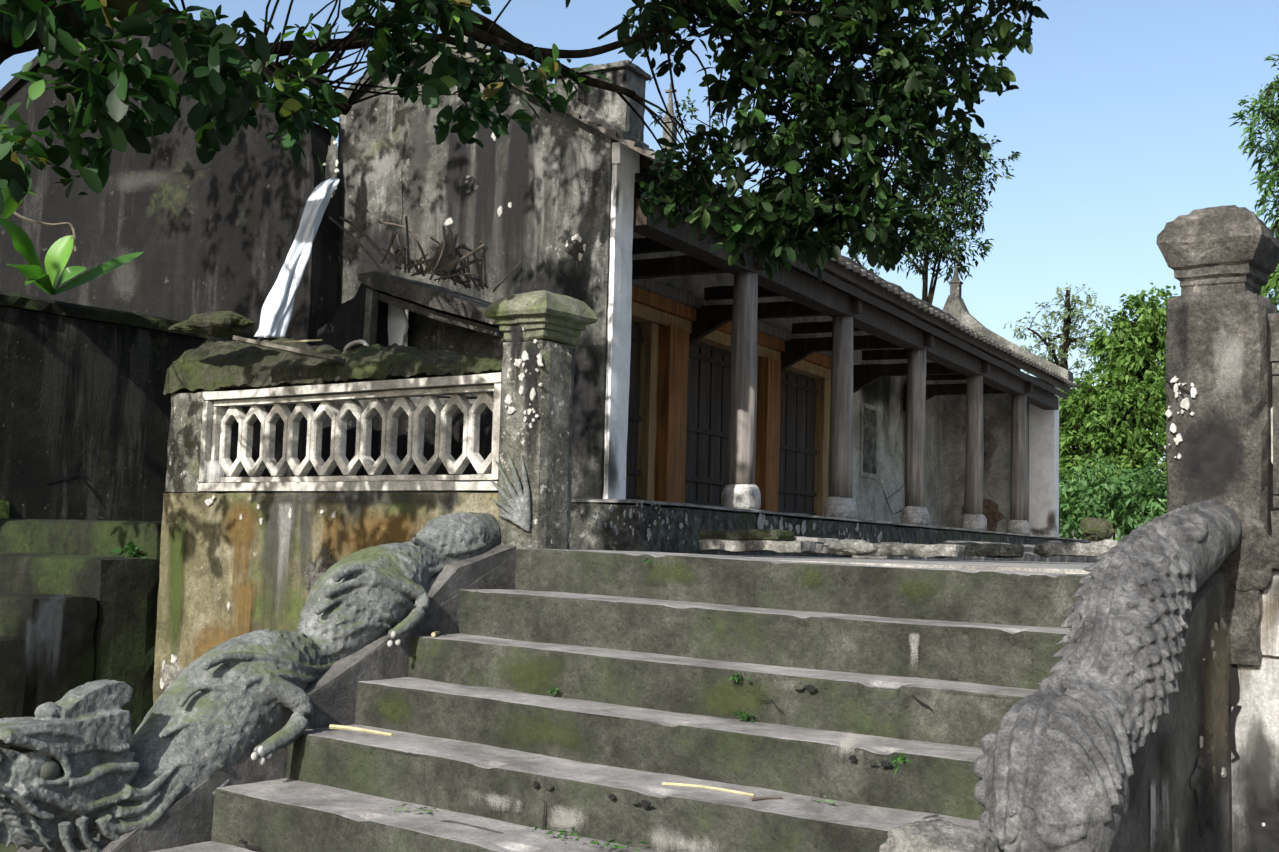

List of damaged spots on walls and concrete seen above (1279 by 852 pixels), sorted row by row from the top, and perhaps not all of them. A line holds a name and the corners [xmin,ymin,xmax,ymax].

water stain [355,112,428,290]
water stain [435,103,586,302]
flaking render [565,234,586,261]
flaking render [504,327,543,436]
water stain [572,332,617,489]
flaking render [1164,376,1198,459]
water stain [168,534,183,658]
water stain [260,490,412,608]
flaking render [594,502,688,541]
flaking render [757,513,816,535]
flaking render [839,523,882,542]
water stain [1175,727,1279,852]